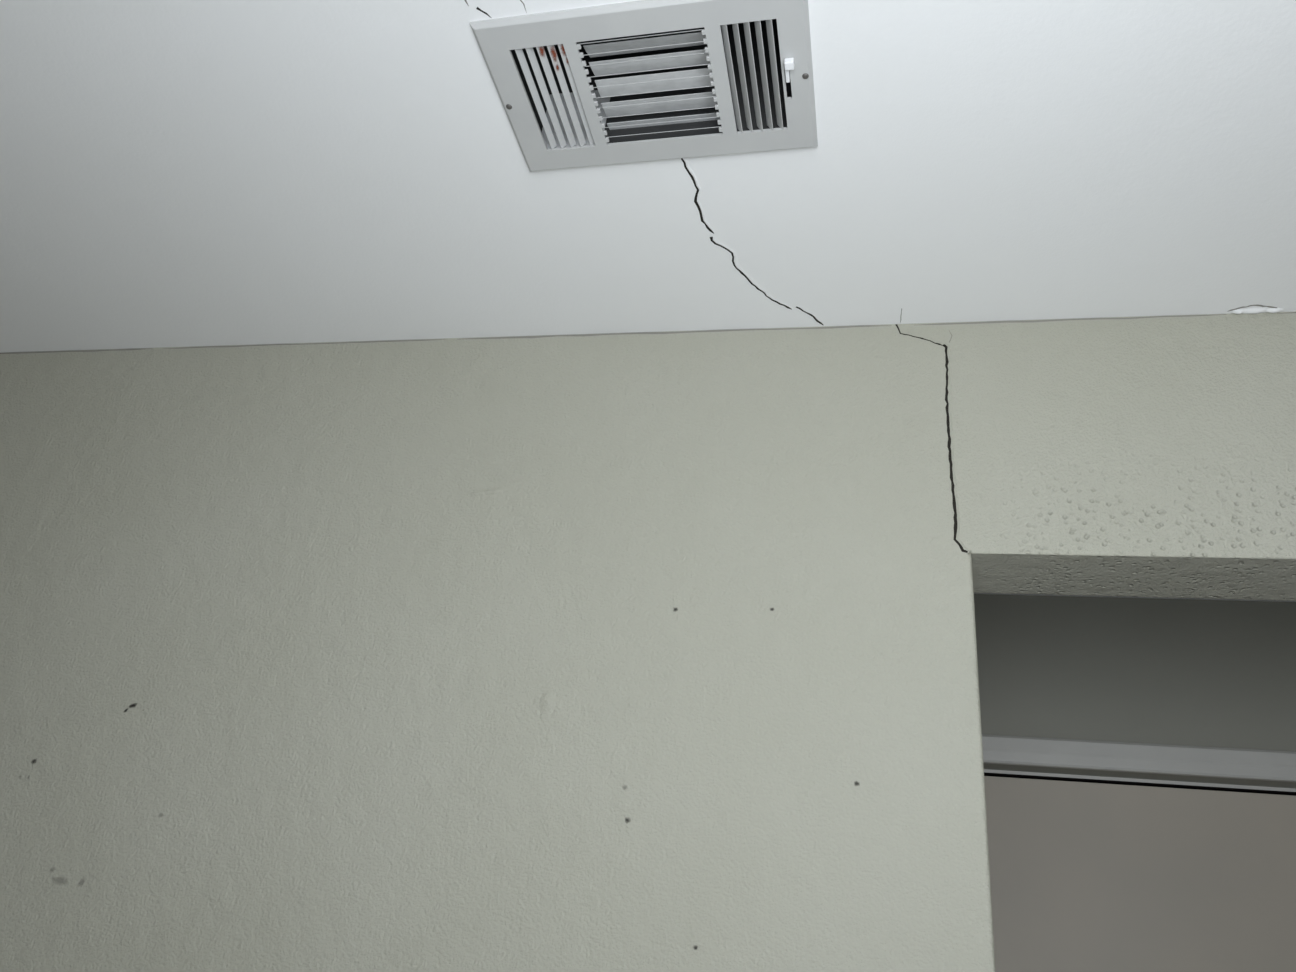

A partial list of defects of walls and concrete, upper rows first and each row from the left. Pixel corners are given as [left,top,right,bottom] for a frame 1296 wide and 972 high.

crack [0,158,1226,553]